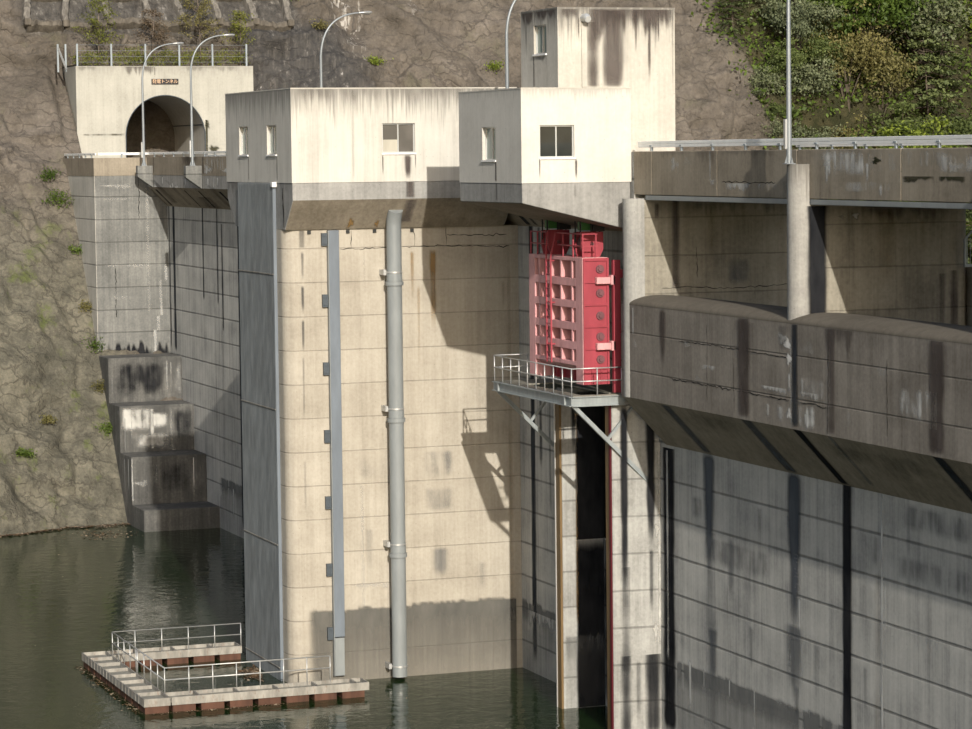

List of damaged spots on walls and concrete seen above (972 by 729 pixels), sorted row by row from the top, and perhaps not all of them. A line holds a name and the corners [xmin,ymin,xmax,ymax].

leakage [522,9,669,86]
leakage [116,164,229,354]
crack [342,230,509,250]
leakage [519,216,540,254]
leakage [121,365,161,392]
leakage [221,226,244,526]
leakage [123,409,190,486]
leakage [918,341,972,501]
leakage [406,399,556,671]
leakage [646,318,852,729]
leakage [312,607,392,678]